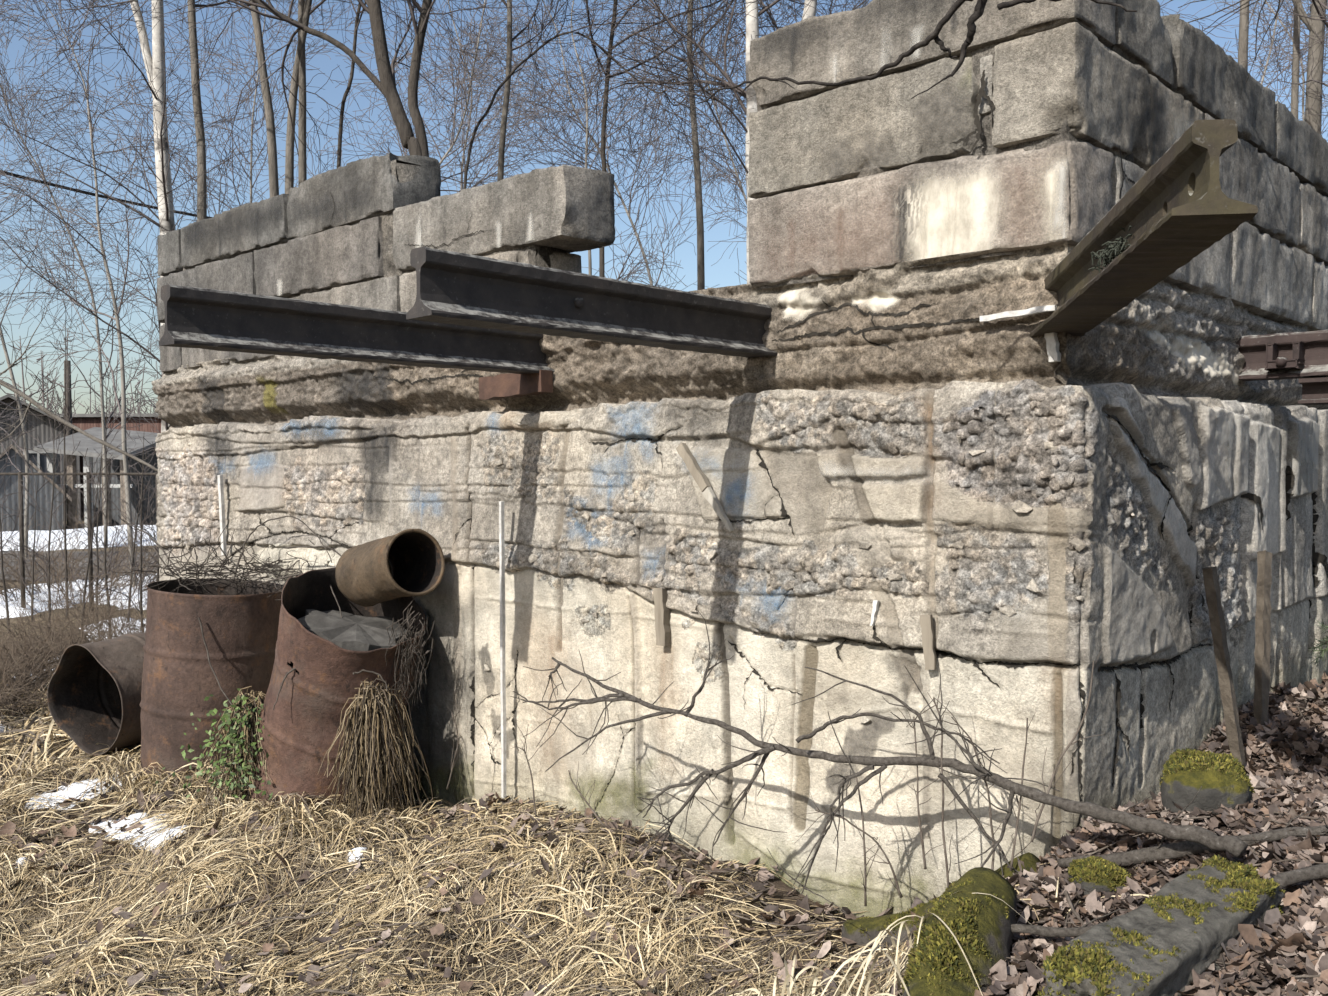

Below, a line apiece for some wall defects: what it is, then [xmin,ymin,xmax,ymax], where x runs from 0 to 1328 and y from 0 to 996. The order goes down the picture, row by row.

crack [949,70,995,153]
crack [704,449,794,535]
spalling [474,429,1095,684]
spalling [754,379,1244,653]
crack [800,575,1213,825]